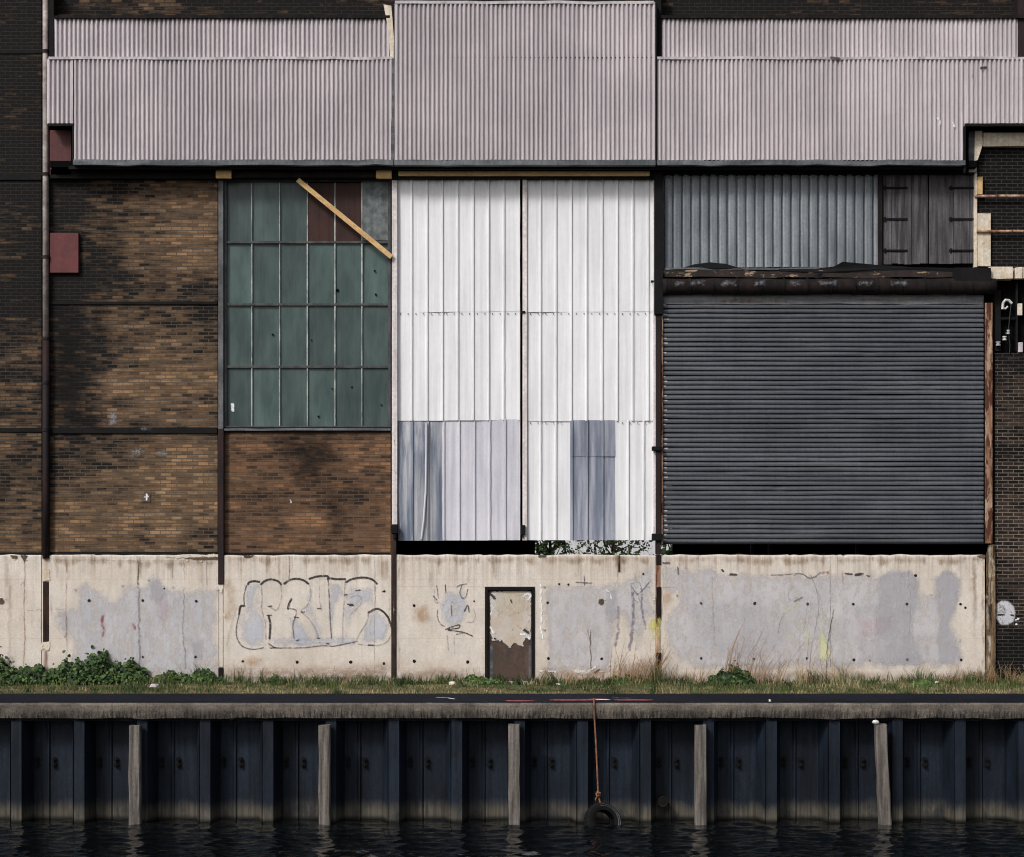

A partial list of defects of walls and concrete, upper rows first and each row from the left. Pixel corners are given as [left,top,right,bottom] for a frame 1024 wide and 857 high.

peeling [490,572,656,670]